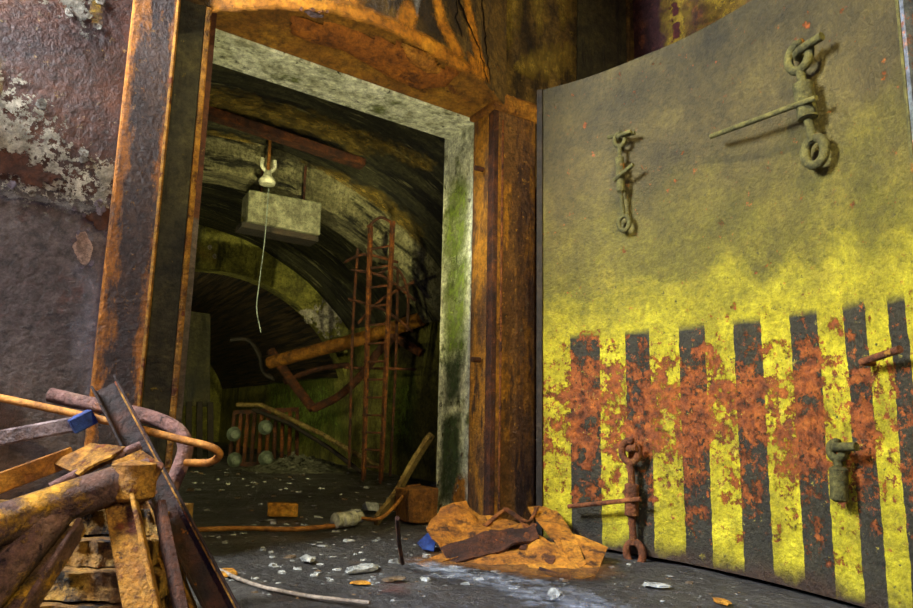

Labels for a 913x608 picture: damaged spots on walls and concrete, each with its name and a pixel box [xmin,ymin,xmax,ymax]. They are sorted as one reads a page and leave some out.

peeling [38,0,107,38]
crack [455,0,491,82]
peeling [0,58,115,269]